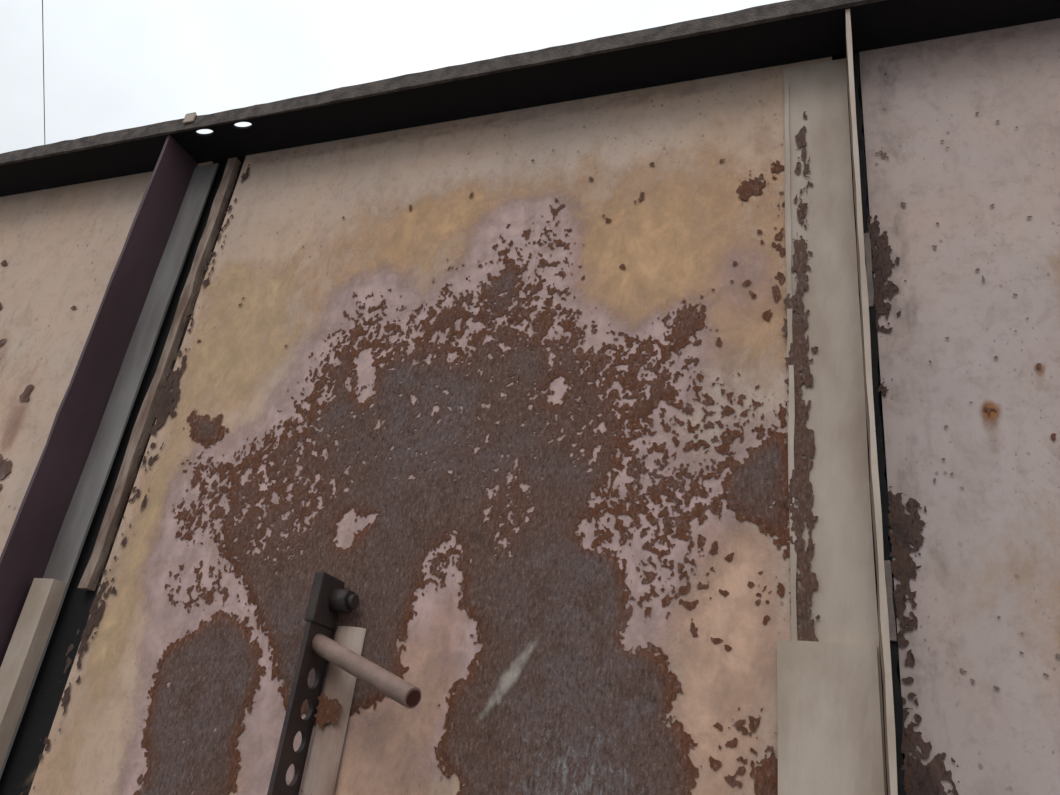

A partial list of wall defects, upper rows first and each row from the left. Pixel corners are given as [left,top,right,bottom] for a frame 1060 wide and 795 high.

rust [60,515,134,715]
peeling [119,194,788,795]
rust [129,111,820,795]
rust [866,207,907,337]
rust [888,486,959,795]
rust [969,401,999,421]